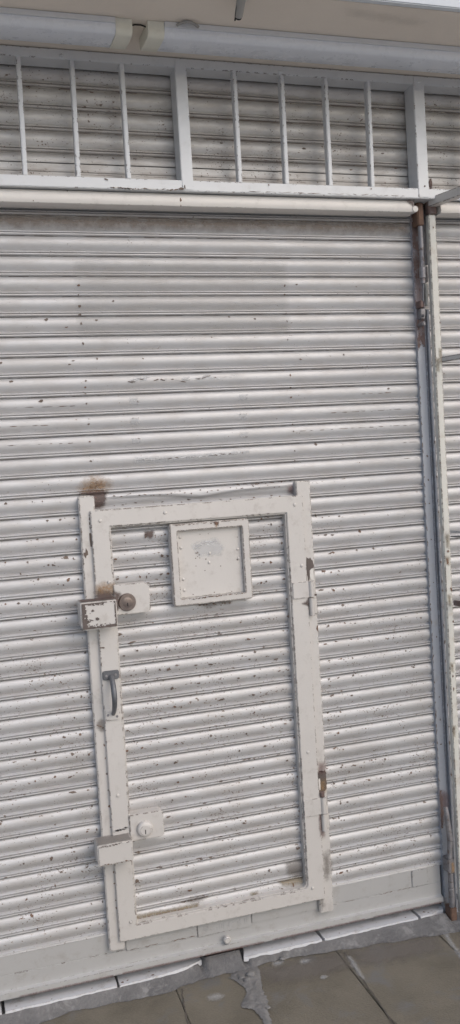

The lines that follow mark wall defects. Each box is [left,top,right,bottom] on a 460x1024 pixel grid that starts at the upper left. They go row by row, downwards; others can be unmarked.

corrosion [407,200,425,351]
corrosion [79,479,106,509]
peeling [20,504,92,582]
corrosion [80,585,121,610]
peeling [306,551,345,606]
peeling [81,596,138,666]
corrosion [318,766,327,792]